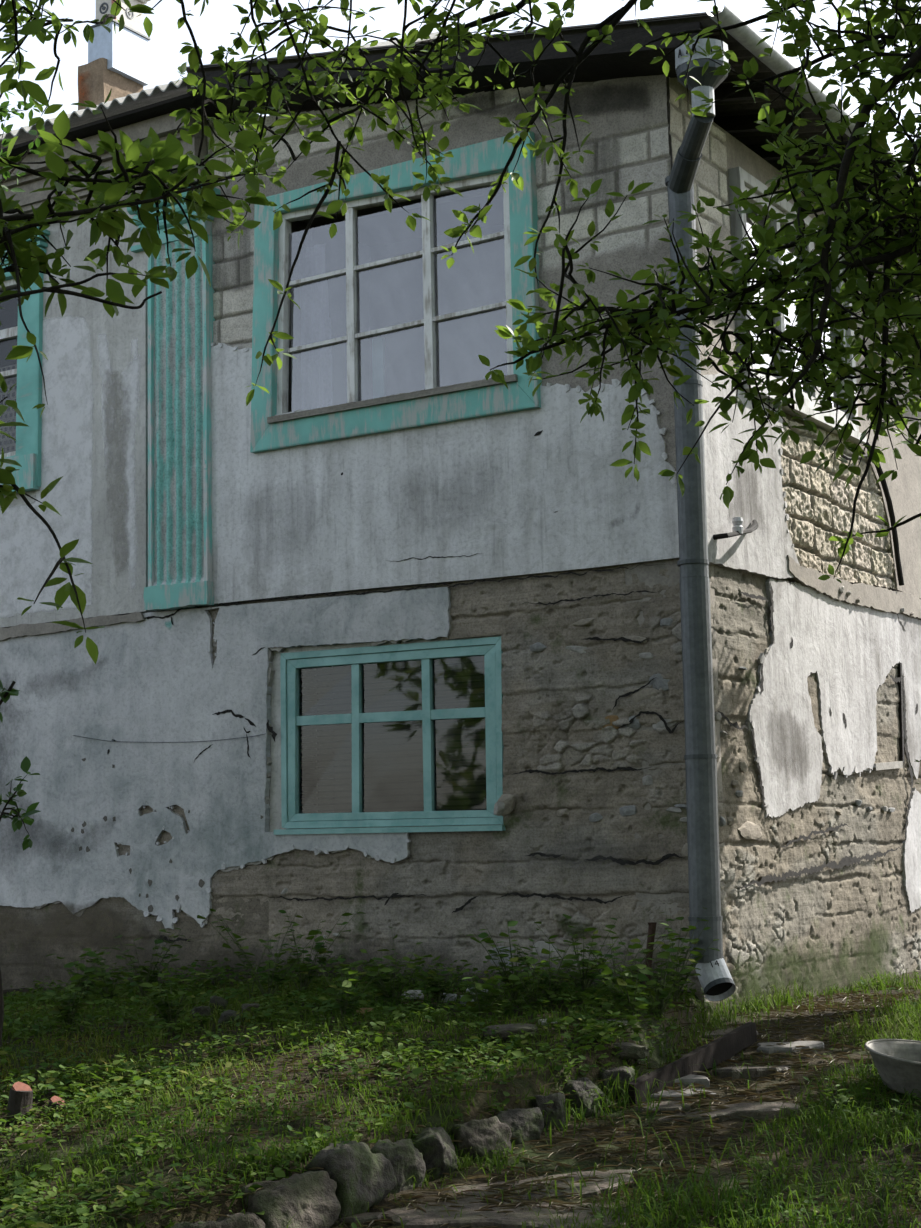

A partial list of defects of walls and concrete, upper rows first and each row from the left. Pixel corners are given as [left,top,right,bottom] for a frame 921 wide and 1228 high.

crack [145,553,666,625]
crack [212,709,277,757]
crack [717,581,793,814]
flaking render [196,559,921,1009]
crack [736,669,918,889]
spalling [116,842,133,874]
spalling [135,802,190,845]
flaking render [139,879,181,923]